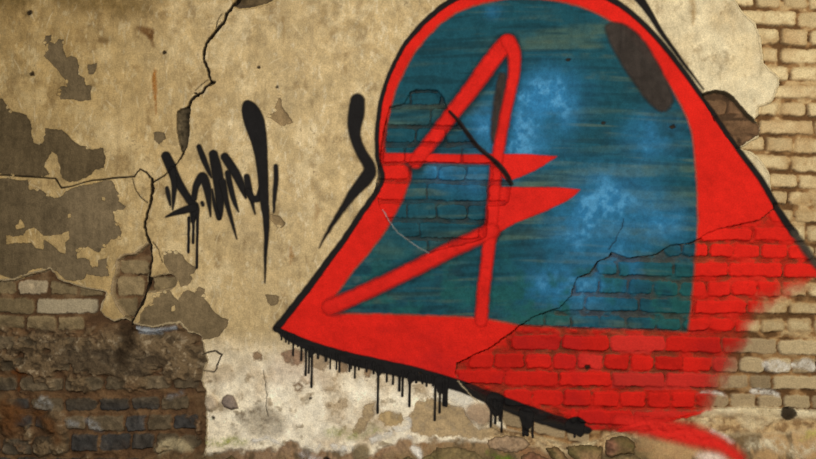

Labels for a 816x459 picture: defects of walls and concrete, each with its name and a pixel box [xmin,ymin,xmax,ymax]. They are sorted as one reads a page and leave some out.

flaking render [42,35,97,101]
crack [189,0,241,104]
flaking render [232,0,279,10]
crack [0,152,185,325]
flaking render [0,98,228,459]
flaking render [401,162,467,184]
flaking render [517,240,736,379]
flaking render [681,0,816,420]